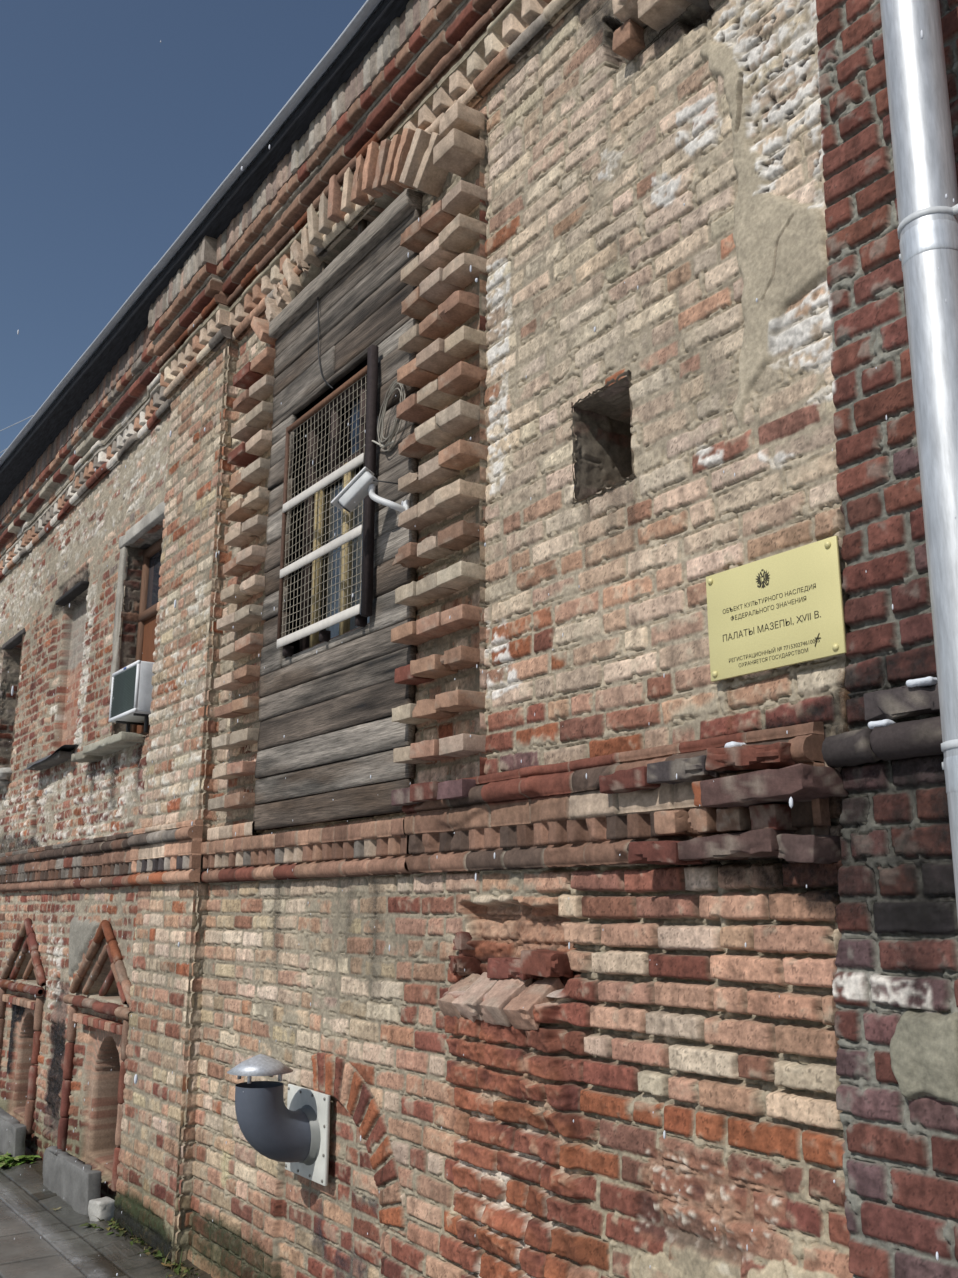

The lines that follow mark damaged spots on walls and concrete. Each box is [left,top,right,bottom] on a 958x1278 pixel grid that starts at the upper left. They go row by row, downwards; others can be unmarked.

crack [760,211,797,302]
peeling [768,280,834,400]
peeling [758,451,787,464]
leakage [113,1205,173,1261]
spalling [635,1145,788,1267]